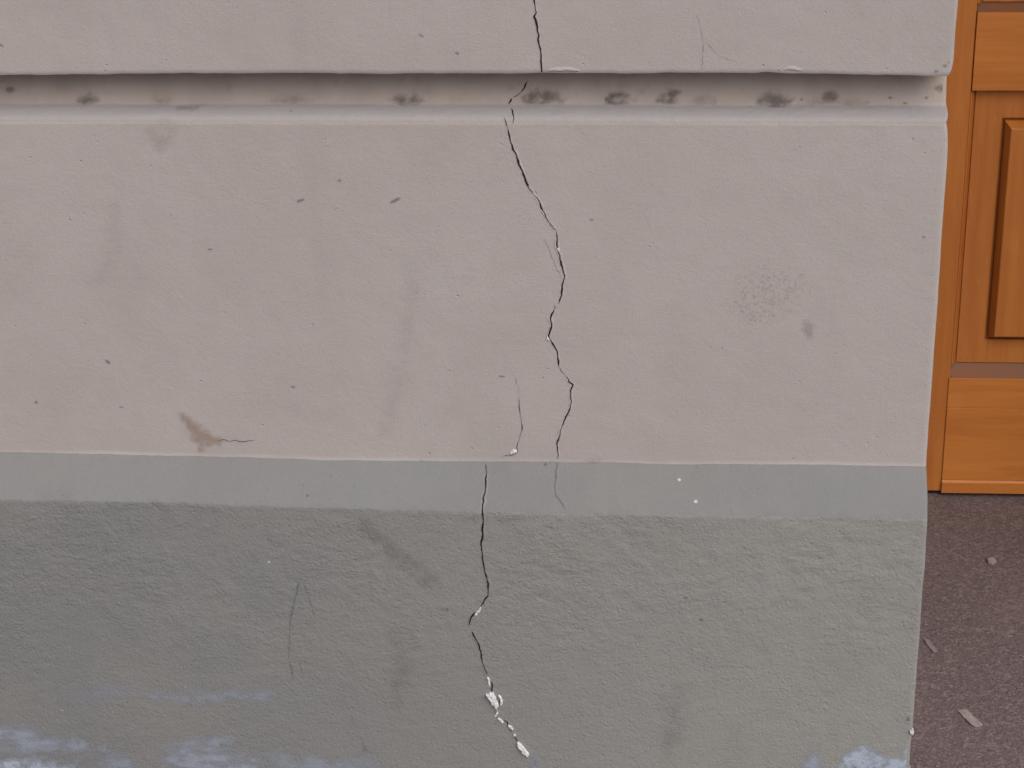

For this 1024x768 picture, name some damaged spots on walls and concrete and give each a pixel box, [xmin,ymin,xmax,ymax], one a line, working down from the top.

crack [504,0,575,508]
crack [467,401,538,768]